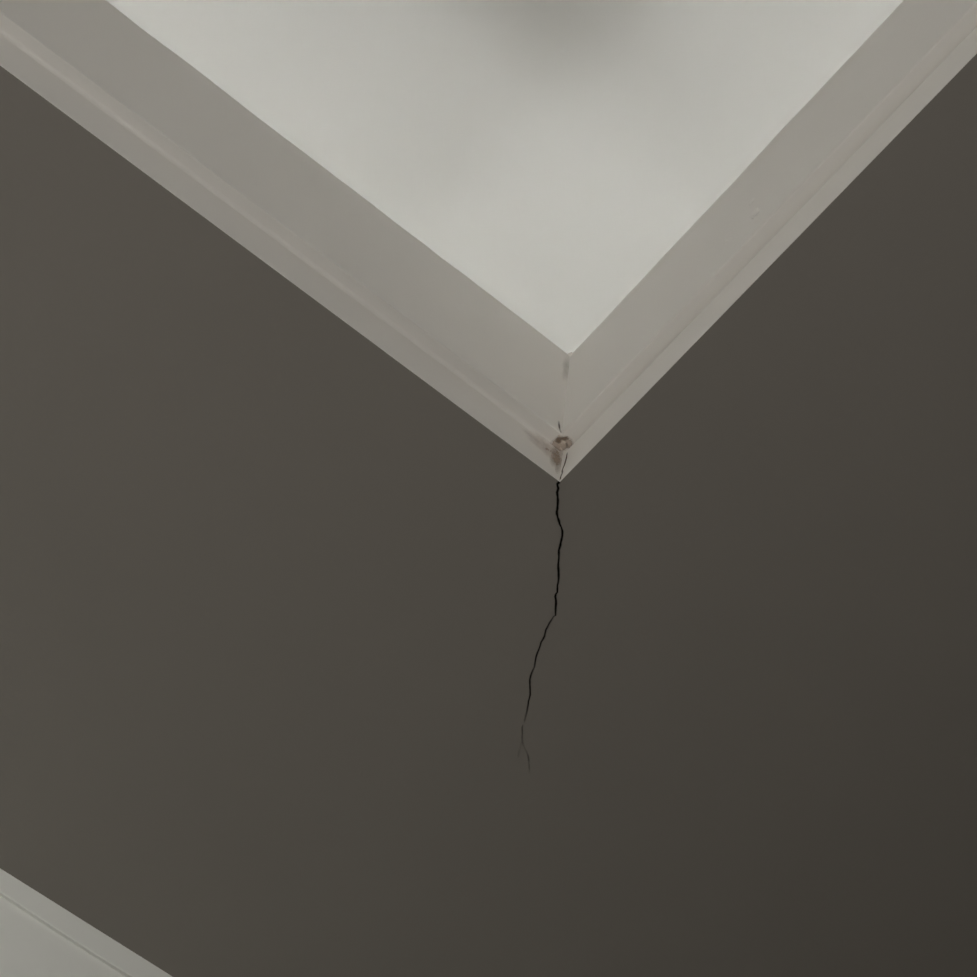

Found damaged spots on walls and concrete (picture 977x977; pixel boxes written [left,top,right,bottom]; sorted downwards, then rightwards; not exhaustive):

crack [522,455,567,734]